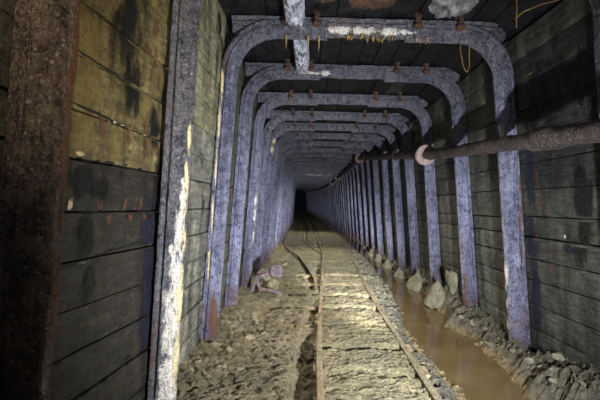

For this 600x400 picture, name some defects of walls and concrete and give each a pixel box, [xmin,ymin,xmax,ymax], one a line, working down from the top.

water stain [428,0,479,19]
water stain [328,26,417,36]
water stain [115,0,162,347]